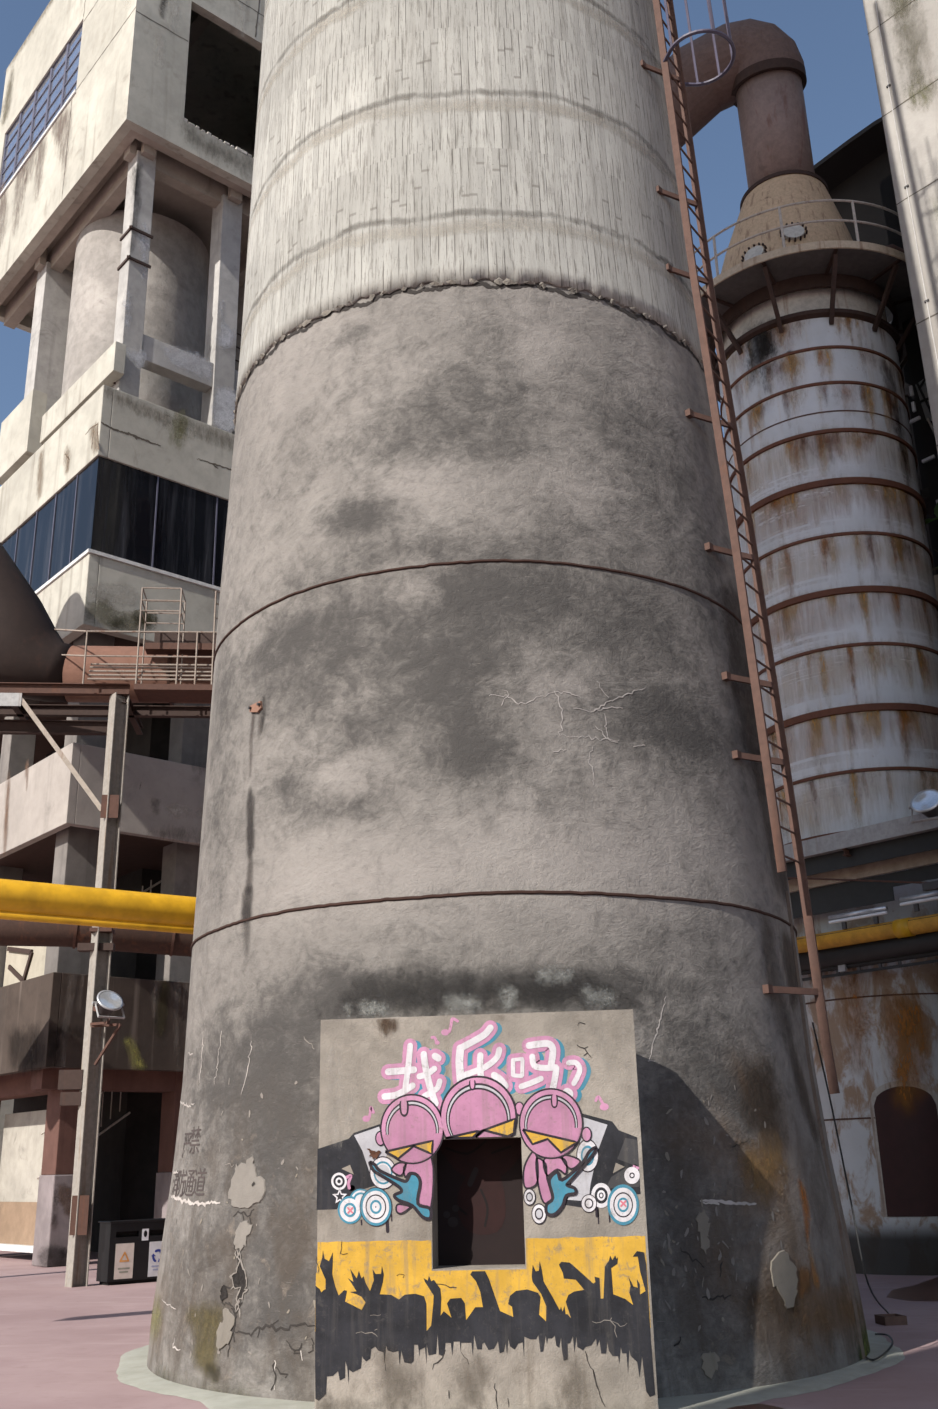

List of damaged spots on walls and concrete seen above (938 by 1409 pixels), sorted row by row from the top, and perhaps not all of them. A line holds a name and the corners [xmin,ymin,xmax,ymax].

rust [843,361,924,523]
damp [242,791,253,922]
rust [888,997,926,1107]
peeling [216,1156,266,1354]
peeling [661,1183,798,1329]